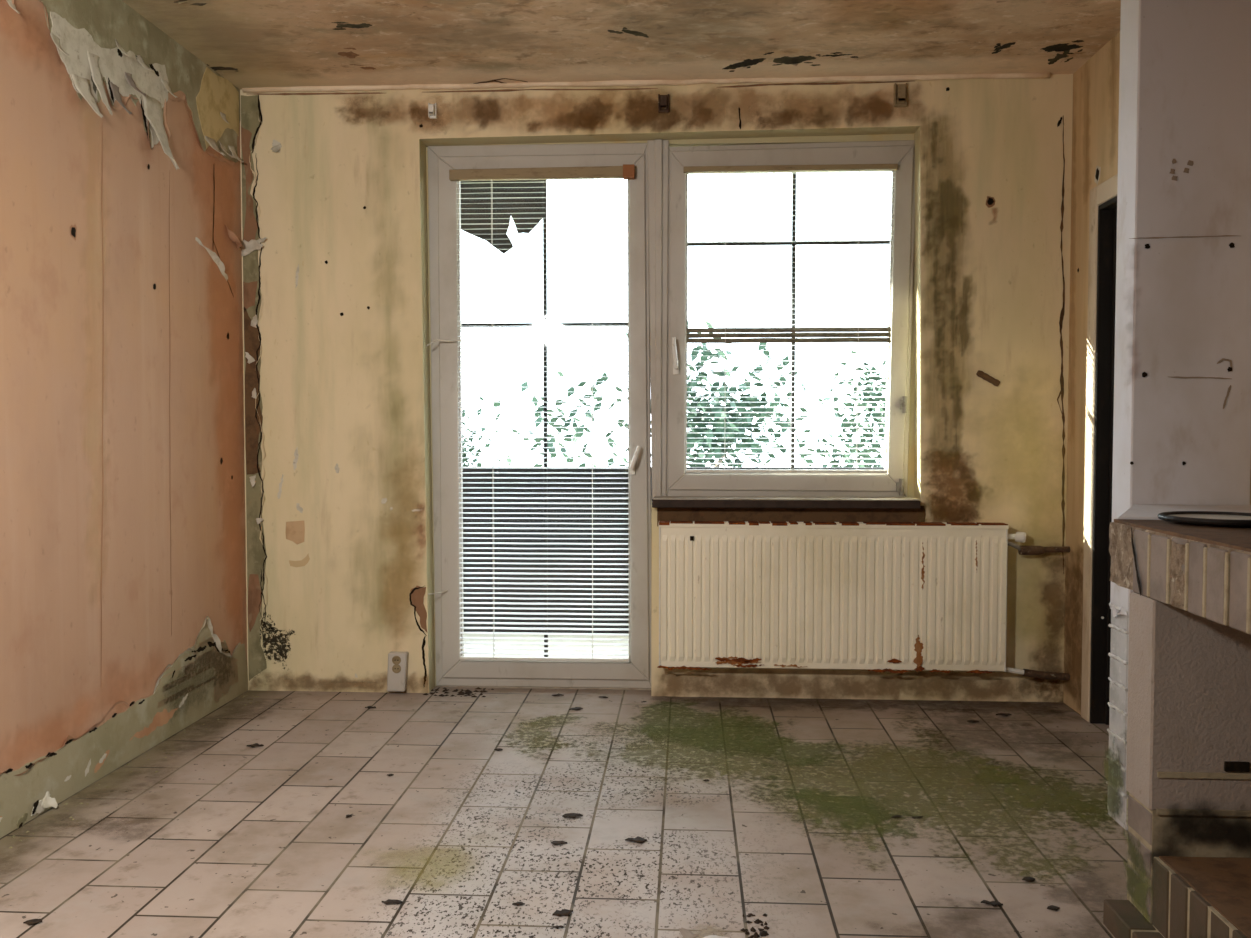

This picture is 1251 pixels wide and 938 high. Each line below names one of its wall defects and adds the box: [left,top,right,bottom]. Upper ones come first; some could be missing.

peeling [331,22,372,30]
peeling [338,48,376,70]
peeling [608,27,649,38]
peeling [723,52,858,72]
peeling [992,42,1016,54]
peeling [1042,40,1084,65]
crack [213,92,383,633]
water stain [926,124,982,522]
crack [1057,115,1065,574]
peeling [0,0,299,838]
flaking render [409,586,428,636]
water stain [663,558,1083,703]